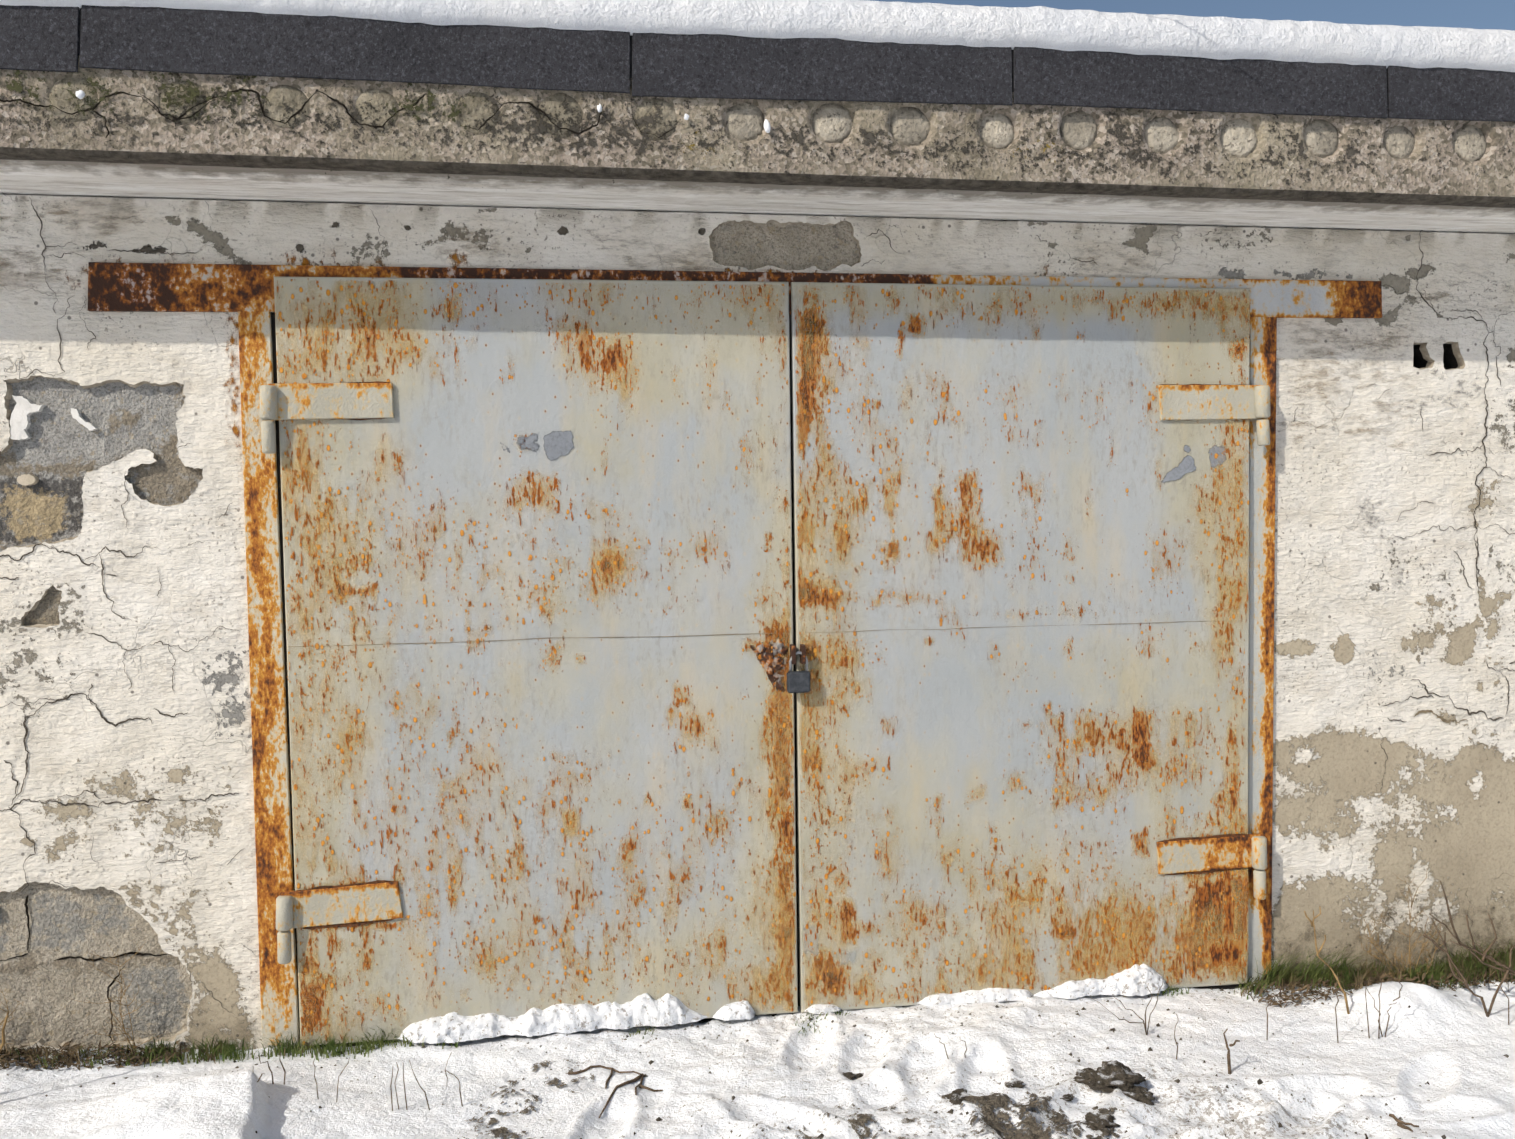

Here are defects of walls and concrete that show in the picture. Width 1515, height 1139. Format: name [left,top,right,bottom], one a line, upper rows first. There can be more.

crack [1,194,194,379]
spalling [0,375,203,552]
rust [224,316,240,445]
spalling [698,220,862,271]
crack [1370,230,1515,600]
crack [0,475,239,1033]
rust [275,250,1250,1045]
peeling [1271,478,1515,974]
crack [1379,661,1515,796]
spalling [0,758,262,1053]